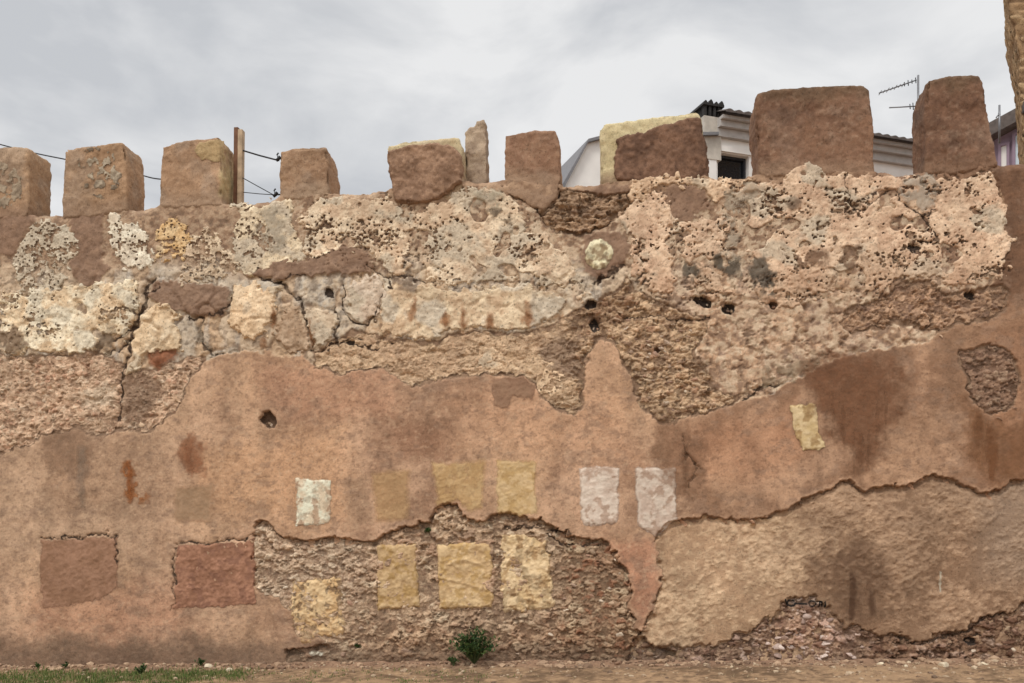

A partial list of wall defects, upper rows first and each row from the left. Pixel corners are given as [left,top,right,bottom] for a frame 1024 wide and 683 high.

crack [105,278,161,421]
crack [259,264,434,352]
peeling [0,161,1021,453]
damp [803,350,905,464]
corrosion [122,461,147,503]
spalling [250,475,1024,663]